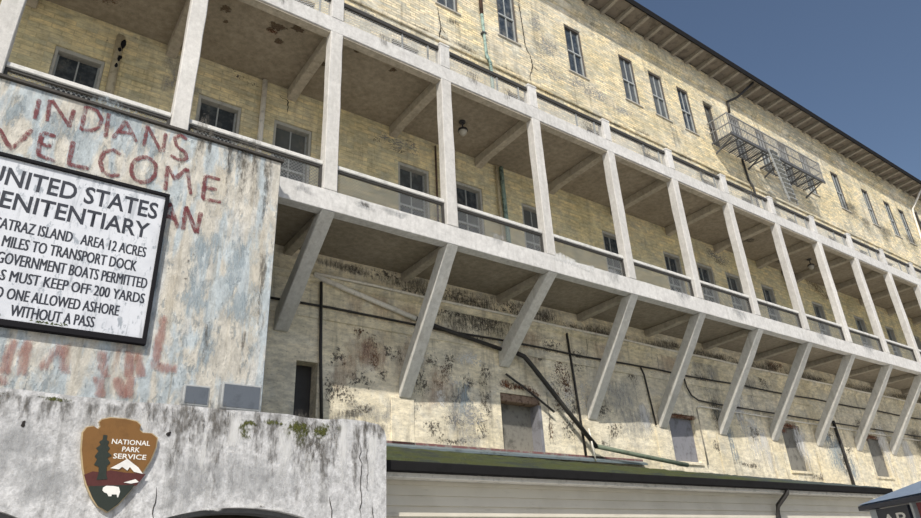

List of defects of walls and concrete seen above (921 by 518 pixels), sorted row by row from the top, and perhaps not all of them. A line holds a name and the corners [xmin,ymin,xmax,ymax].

crack [518,4,536,80]